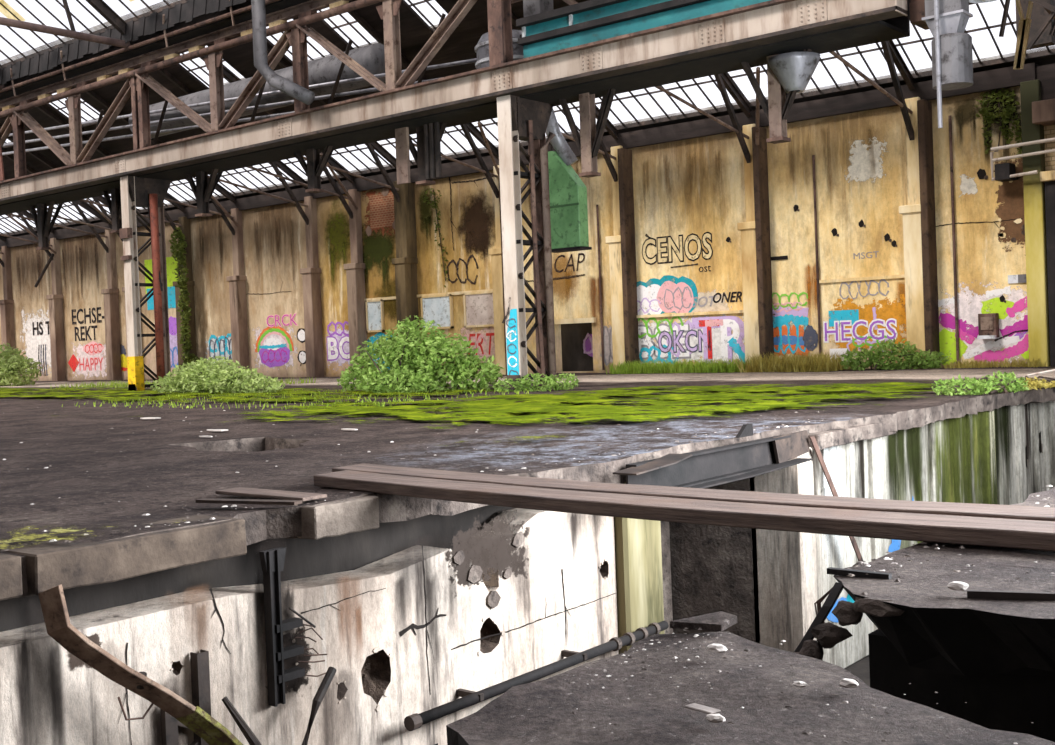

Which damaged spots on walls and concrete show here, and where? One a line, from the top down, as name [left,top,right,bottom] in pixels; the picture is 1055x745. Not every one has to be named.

damp [458,191,495,254]
peeling [845,136,888,183]
peeling [959,153,1025,252]
crack [209,588,231,654]
spalling [69,508,619,745]
crack [399,545,616,695]
spalling [0,626,162,745]